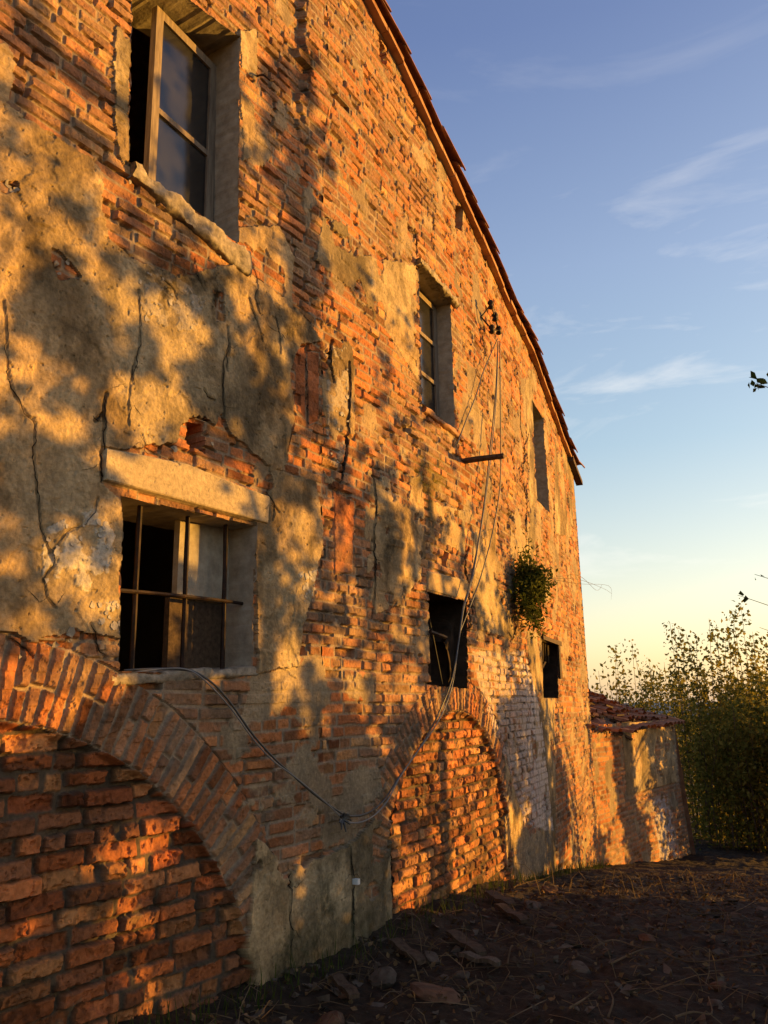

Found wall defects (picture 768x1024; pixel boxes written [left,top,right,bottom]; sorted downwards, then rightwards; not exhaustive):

spalling [102,165,226,331]
crack [4,290,181,607]
spalling [154,413,274,495]
crack [203,327,237,416]
peeling [323,341,351,470]
peeling [299,569,318,602]